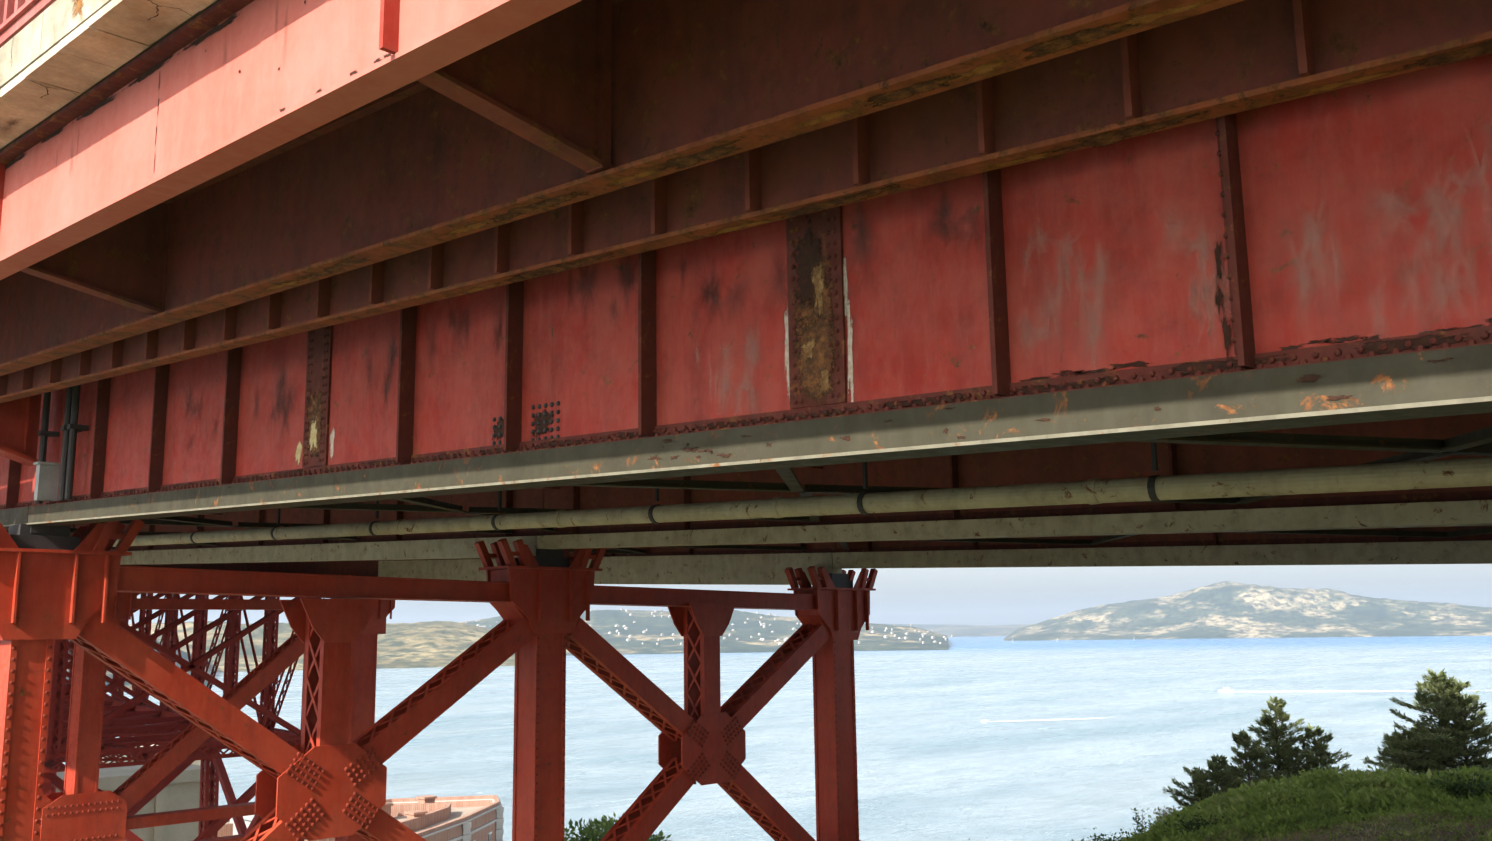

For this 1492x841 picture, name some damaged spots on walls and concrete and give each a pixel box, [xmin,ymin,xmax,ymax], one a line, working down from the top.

rust [611,184,900,460]
rust [1010,241,1492,396]
rust [72,391,399,504]
rust [532,409,587,448]
rust [879,393,967,422]